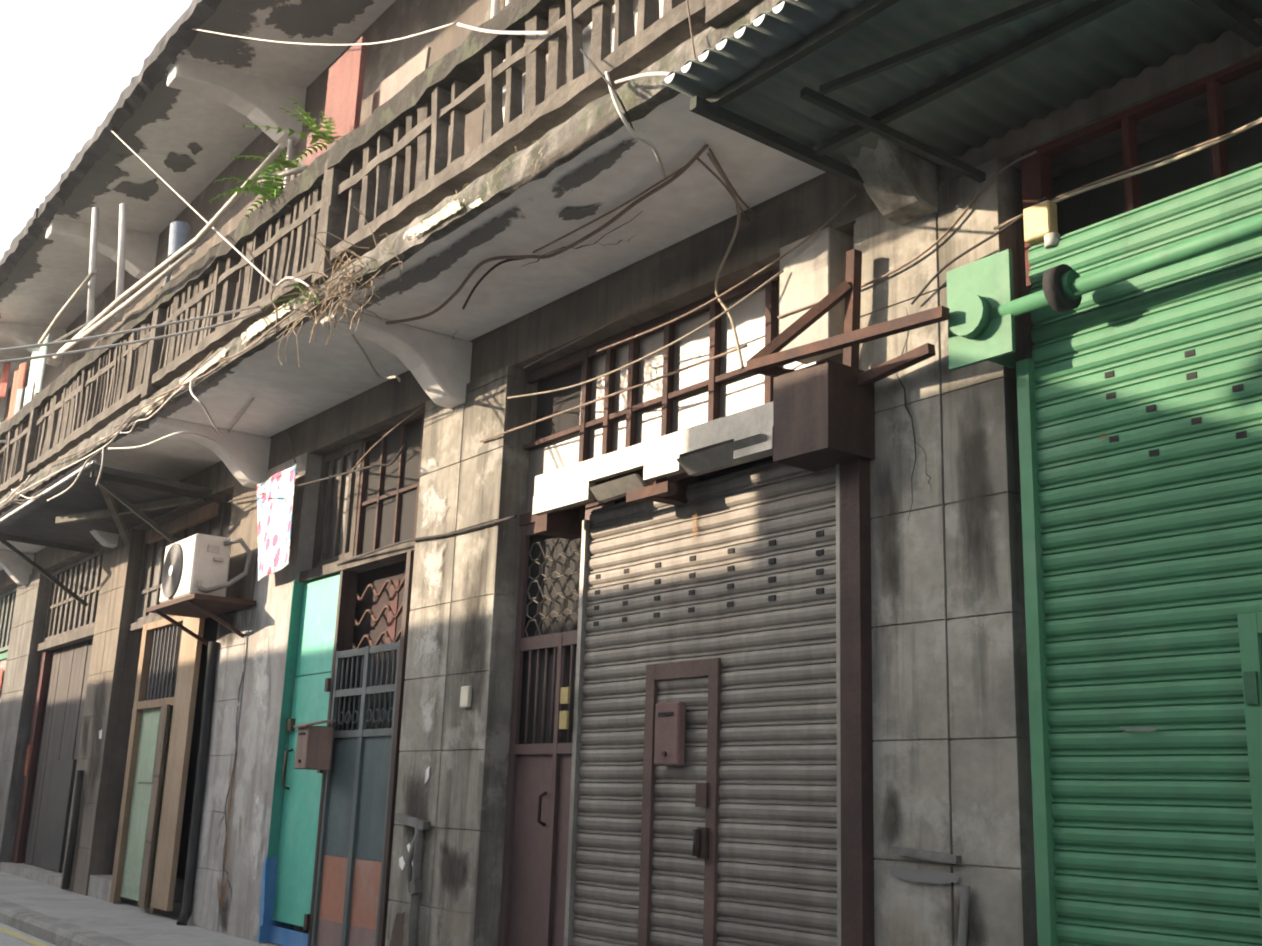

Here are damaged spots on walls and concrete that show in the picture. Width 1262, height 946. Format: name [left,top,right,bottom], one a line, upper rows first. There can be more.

peeling [264,0,374,38]
peeling [163,142,203,172]
peeling [112,178,159,201]
crack [896,308,932,521]
damp [958,422,993,576]
damp [879,477,896,588]
damp [463,560,485,695]
damp [406,766,430,866]
damp [884,791,899,846]
damp [441,845,465,894]
damp [952,898,982,946]